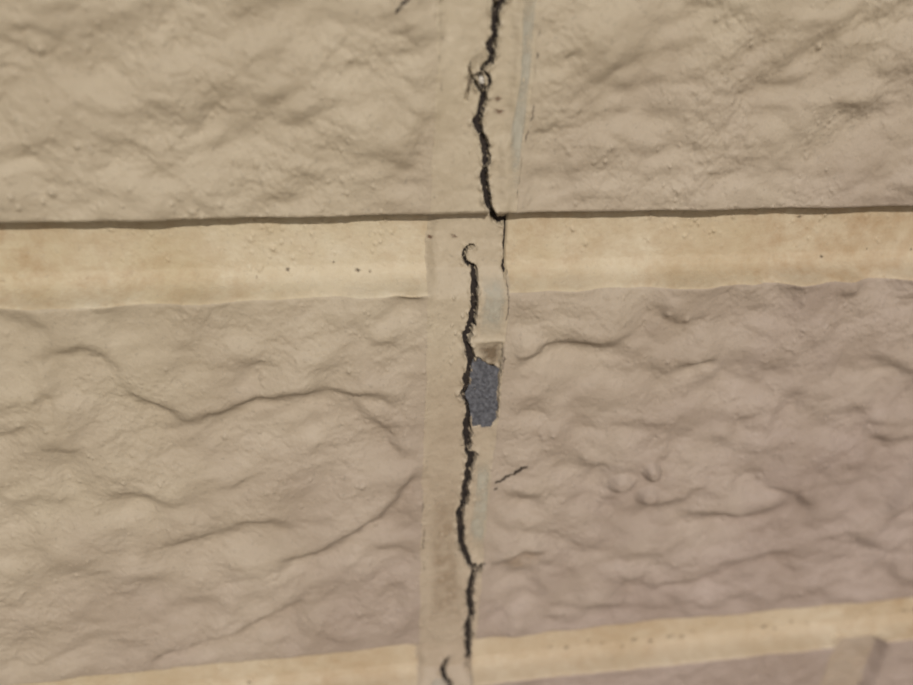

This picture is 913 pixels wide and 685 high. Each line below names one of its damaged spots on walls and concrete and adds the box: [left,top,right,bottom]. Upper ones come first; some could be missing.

crack [467,0,511,294]
crack [431,244,494,685]
peeling [465,347,499,427]
crack [494,467,527,490]